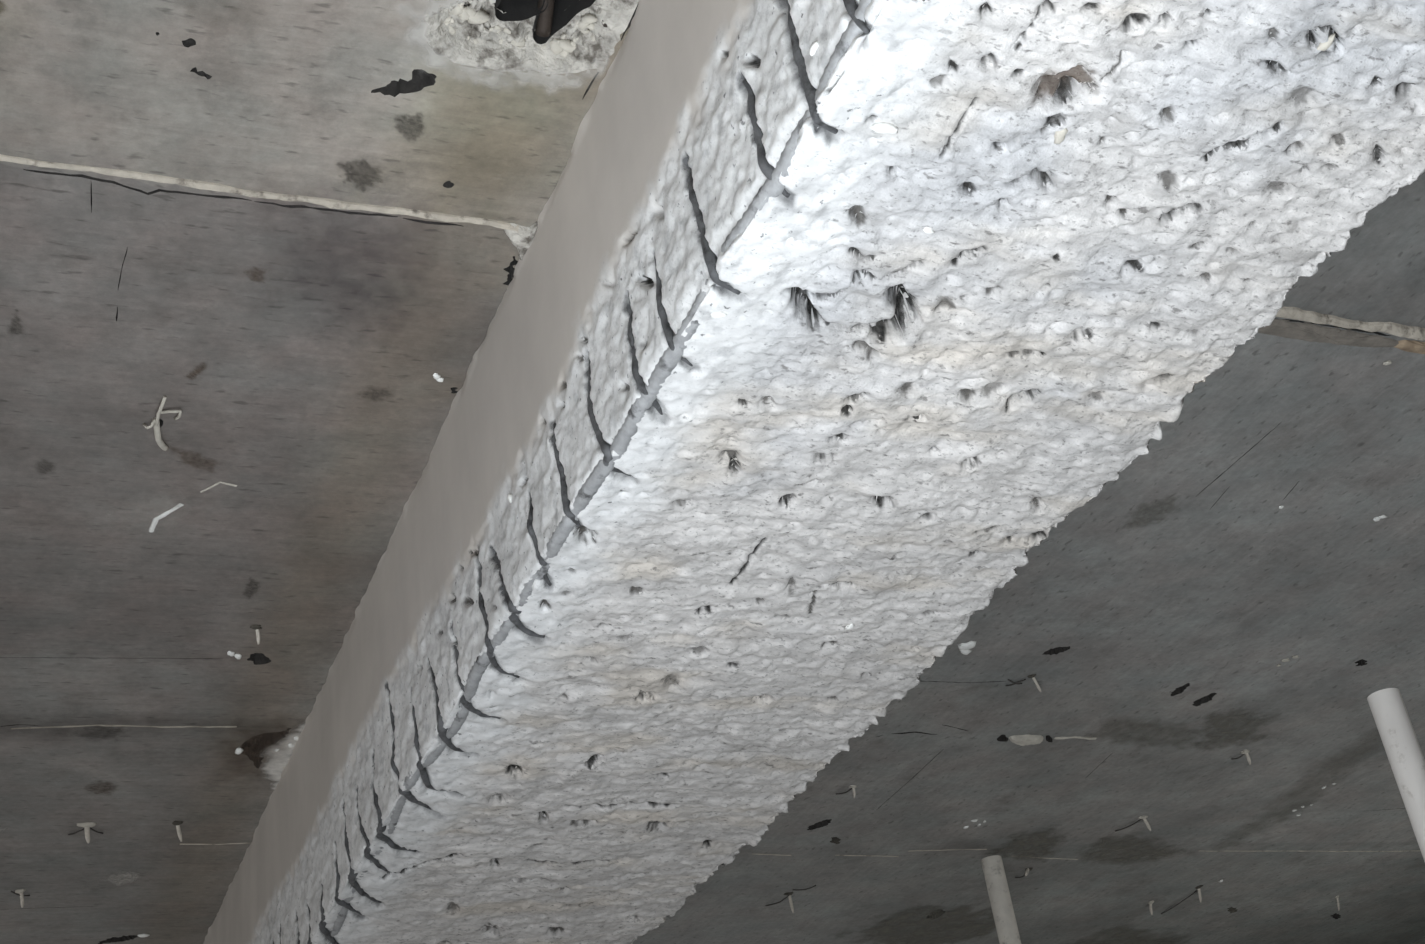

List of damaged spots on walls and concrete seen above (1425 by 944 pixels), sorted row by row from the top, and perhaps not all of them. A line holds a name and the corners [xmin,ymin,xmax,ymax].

spalling [1123,11,1169,28]
spalling [930,60,958,83]
spalling [1161,171,1175,190]
spalling [1126,260,1143,272]
spalling [849,247,914,358]
spalling [273,0,872,944]
peeling [958,641,976,655]
spalling [235,725,305,790]